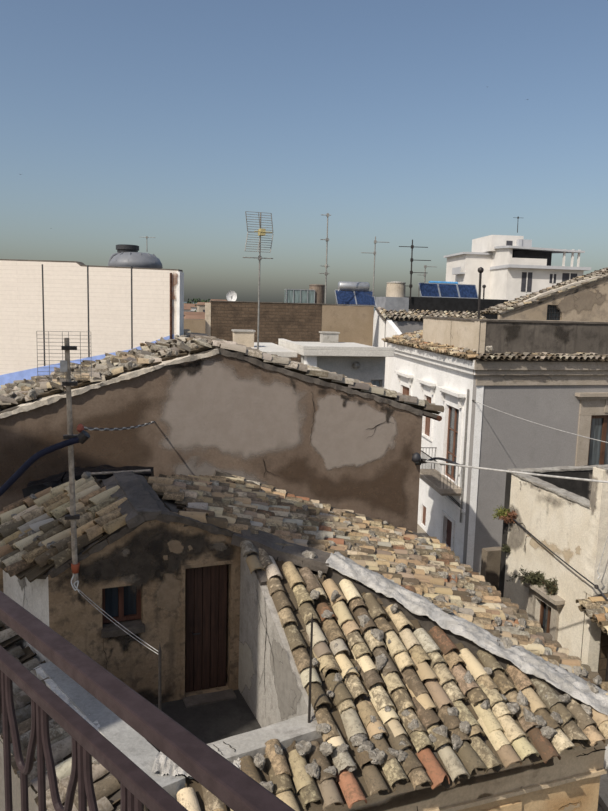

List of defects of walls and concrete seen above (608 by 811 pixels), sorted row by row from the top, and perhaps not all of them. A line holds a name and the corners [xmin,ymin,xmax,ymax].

leakage [109,634,141,651]